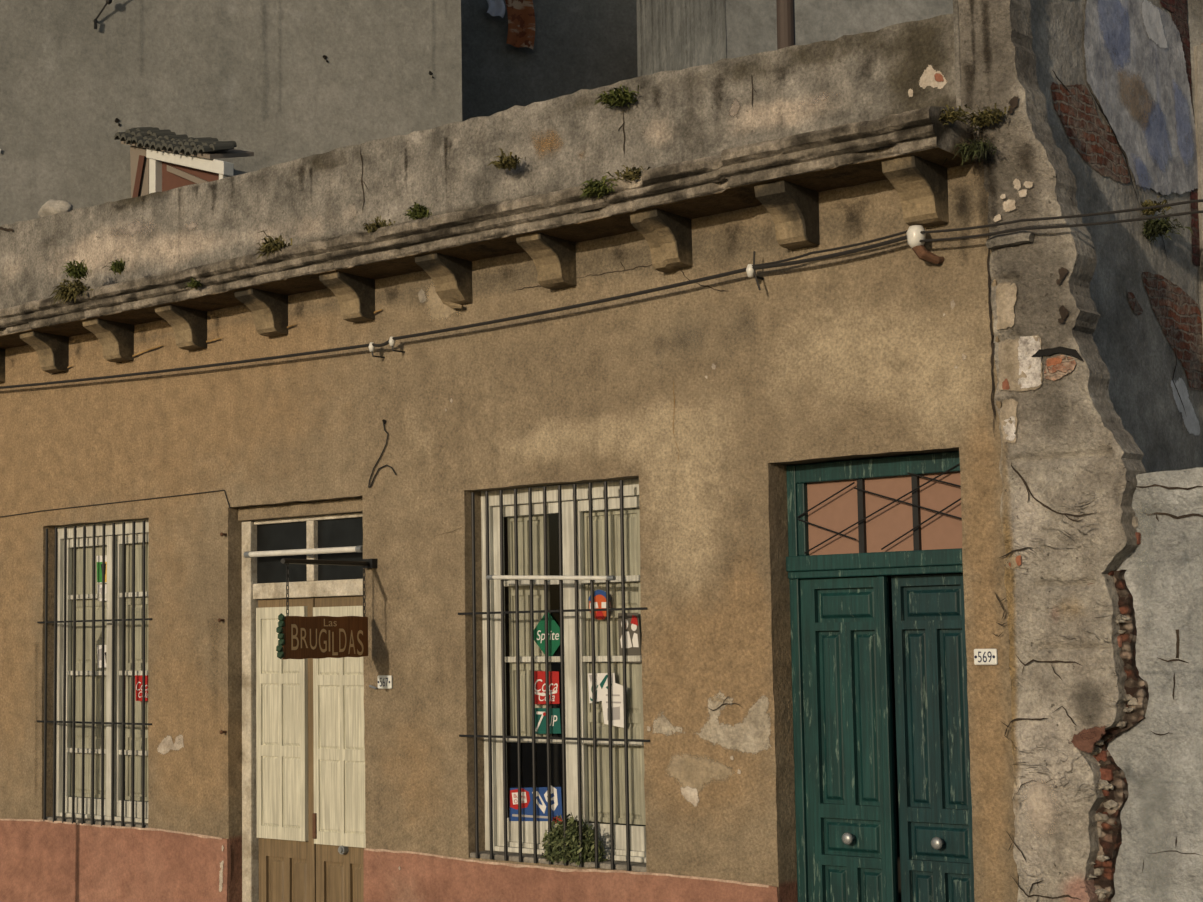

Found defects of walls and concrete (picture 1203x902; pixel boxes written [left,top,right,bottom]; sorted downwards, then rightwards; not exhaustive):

spalling [908,65,947,97]
spalling [1008,96,1018,114]
peeling [1051,0,1200,266]
spalling [1056,267,1068,285]
peeling [996,282,1076,443]
spalling [1127,272,1203,436]
peeling [157,734,184,755]
peeling [647,691,771,807]